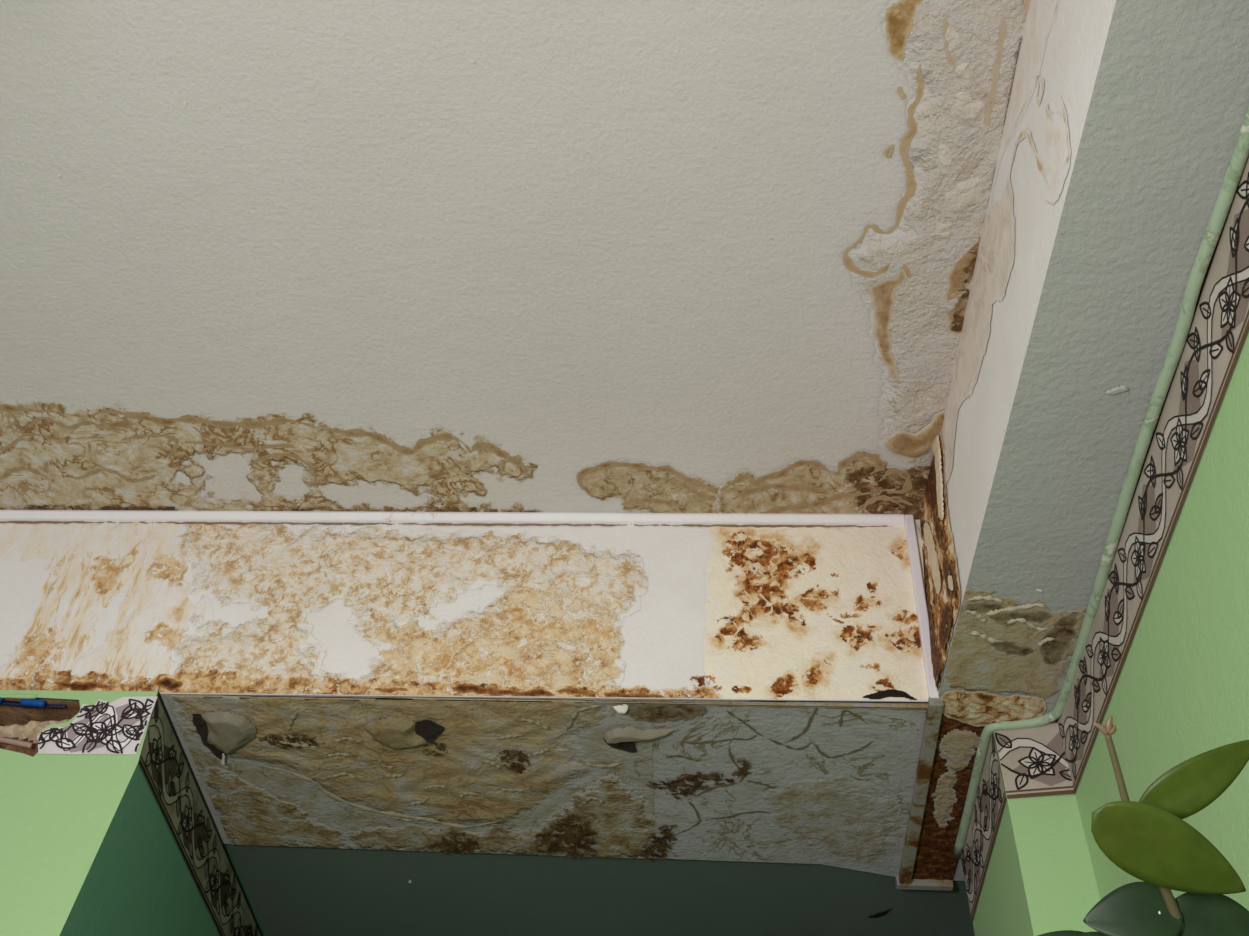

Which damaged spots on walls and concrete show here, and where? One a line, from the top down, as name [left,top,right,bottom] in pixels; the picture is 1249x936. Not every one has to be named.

peeling [884,411,945,520]
damp [0,399,928,867]
peeling [940,588,1087,699]
spalling [0,694,80,757]
peeling [604,703,928,753]
crack [652,679,952,868]